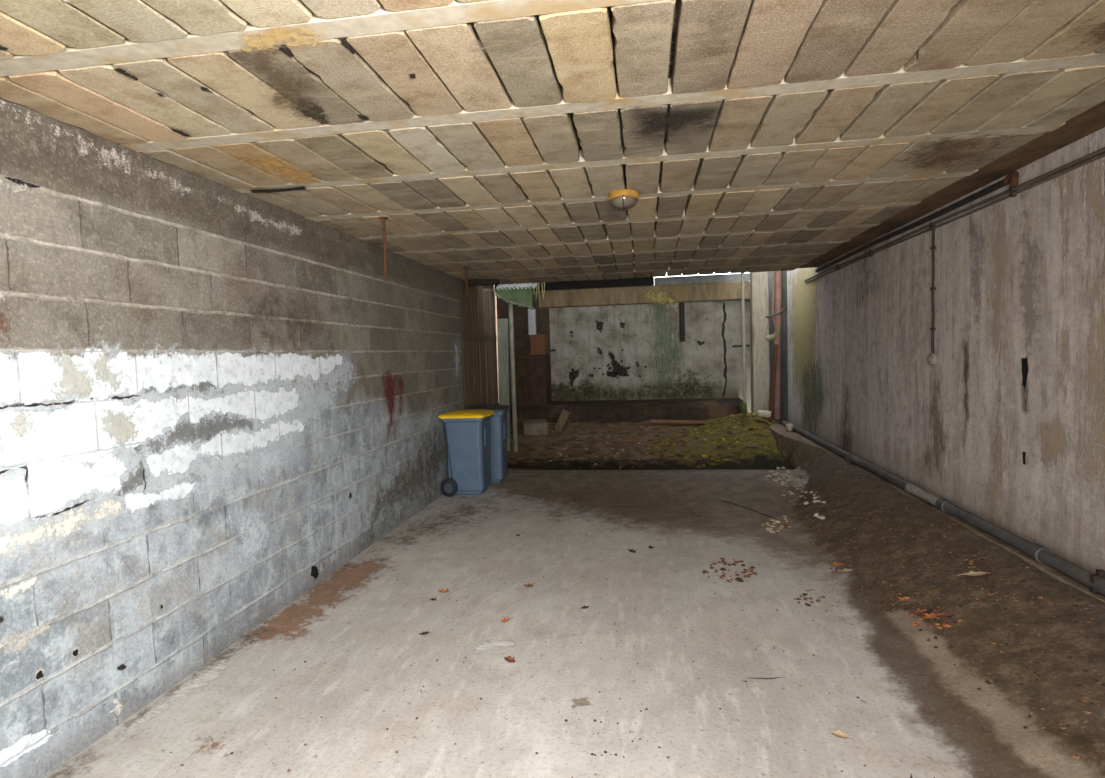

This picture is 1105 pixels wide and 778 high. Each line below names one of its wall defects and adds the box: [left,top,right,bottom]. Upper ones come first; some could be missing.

leakage [235,27,329,125]
leakage [901,135,999,168]
crack [720,303,728,398]
peeling [0,340,357,560]